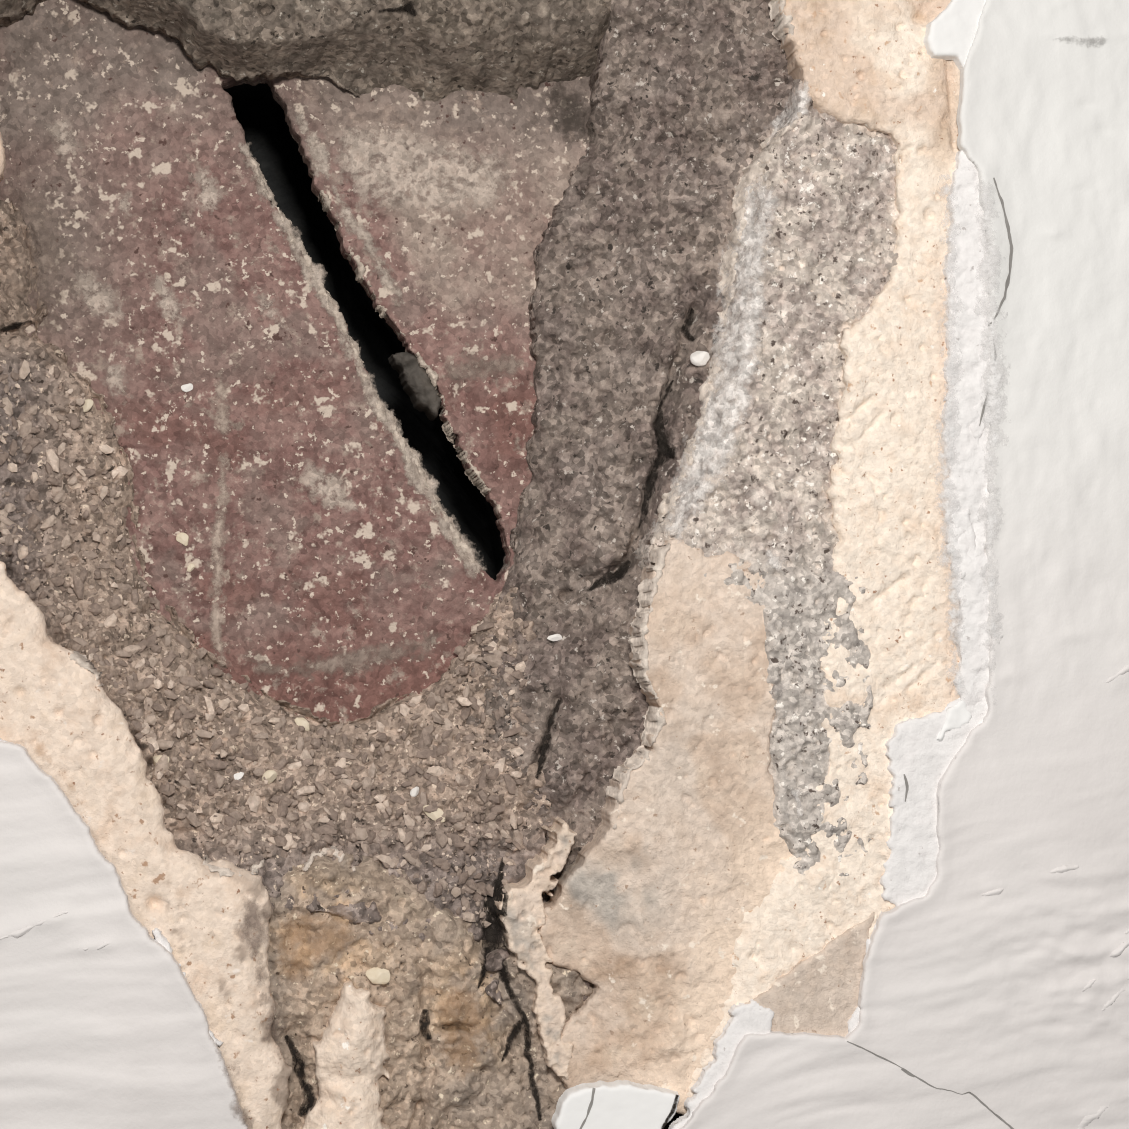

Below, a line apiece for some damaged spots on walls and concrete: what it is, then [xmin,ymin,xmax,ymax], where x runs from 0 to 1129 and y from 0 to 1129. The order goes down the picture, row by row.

crack [223,83,506,580]
crack [979,393,988,426]
crack [988,178,1013,360]
spalling [0,200,678,1129]
spalling [478,0,1007,1129]
crack [478,857,542,1121]
crack [580,1088,596,1129]
crack [847,1041,1014,1129]